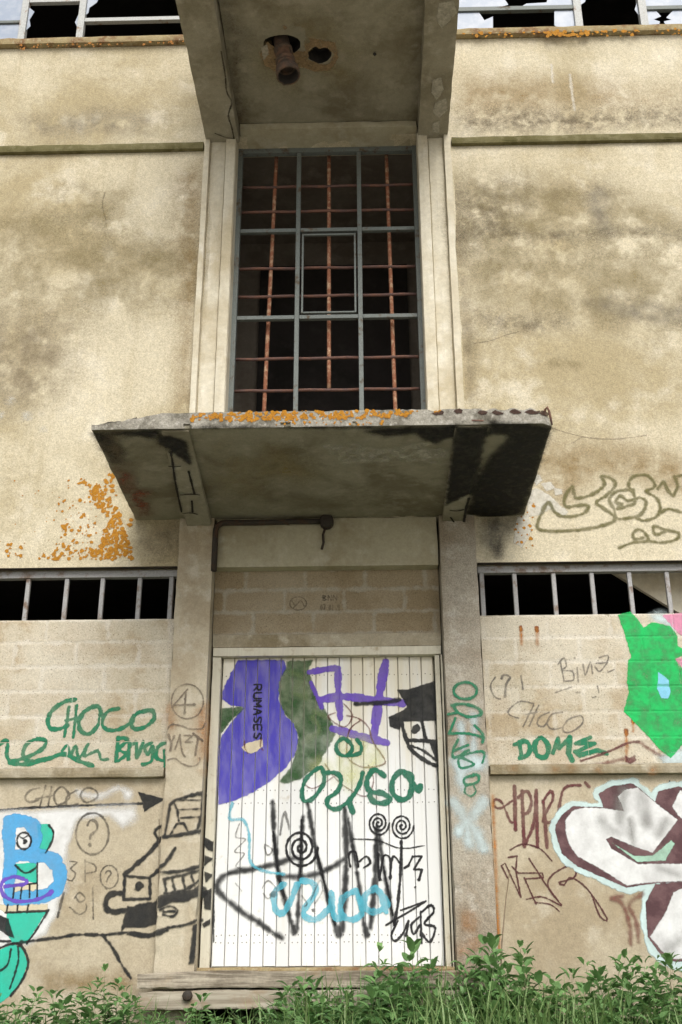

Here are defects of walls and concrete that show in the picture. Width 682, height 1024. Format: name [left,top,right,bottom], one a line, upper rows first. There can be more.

crack [215,51,235,139]
spalling [292,38,339,72]
leakage [90,429,191,510]